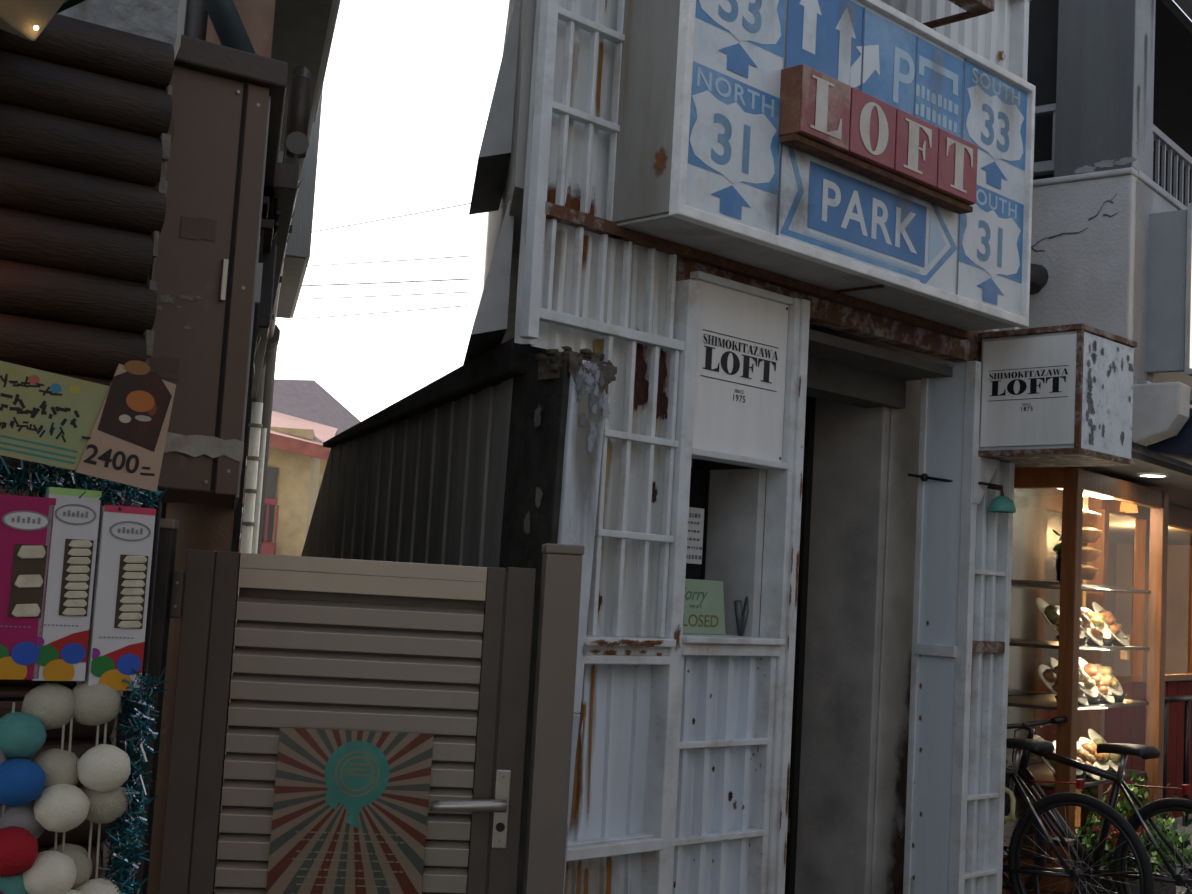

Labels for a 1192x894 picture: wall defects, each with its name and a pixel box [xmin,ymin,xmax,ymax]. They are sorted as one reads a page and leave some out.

crack [1031,194,1118,252]
peeling [534,346,617,452]
peeling [524,487,543,534]
corrosion [570,627,681,823]